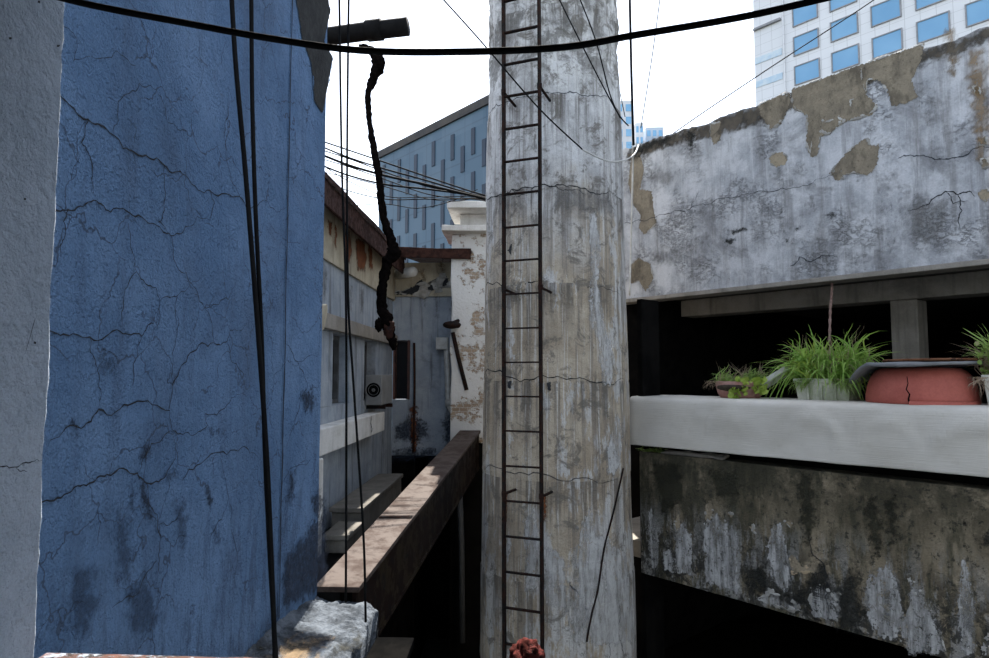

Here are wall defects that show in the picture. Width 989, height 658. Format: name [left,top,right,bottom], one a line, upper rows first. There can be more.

spalling [297,0,333,112]
crack [486,184,620,200]
peeling [628,152,657,234]
damp [626,105,765,161]
peeling [758,43,925,157]
peeling [829,138,879,181]
crack [910,191,975,228]
crack [899,146,989,160]
damp [919,27,989,159]
crack [0,0,315,608]
damp [797,471,817,557]
damp [776,563,865,635]